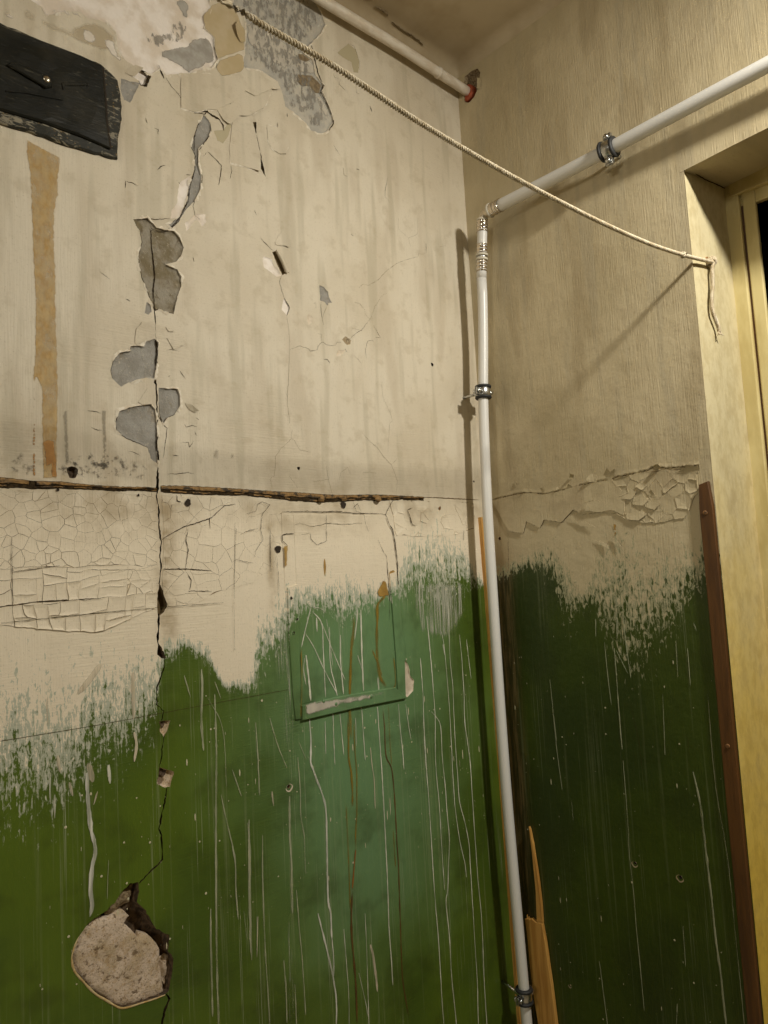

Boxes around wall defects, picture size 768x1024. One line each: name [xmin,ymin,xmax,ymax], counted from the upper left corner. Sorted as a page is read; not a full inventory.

flaking render [31,0,338,332]
flaking render [111,339,199,467]
crack [0,78,476,884]
peeling [492,461,700,533]
flaking render [159,720,170,736]
flaking render [157,767,174,787]
spalling [71,882,173,1009]
crack [161,994,171,1024]